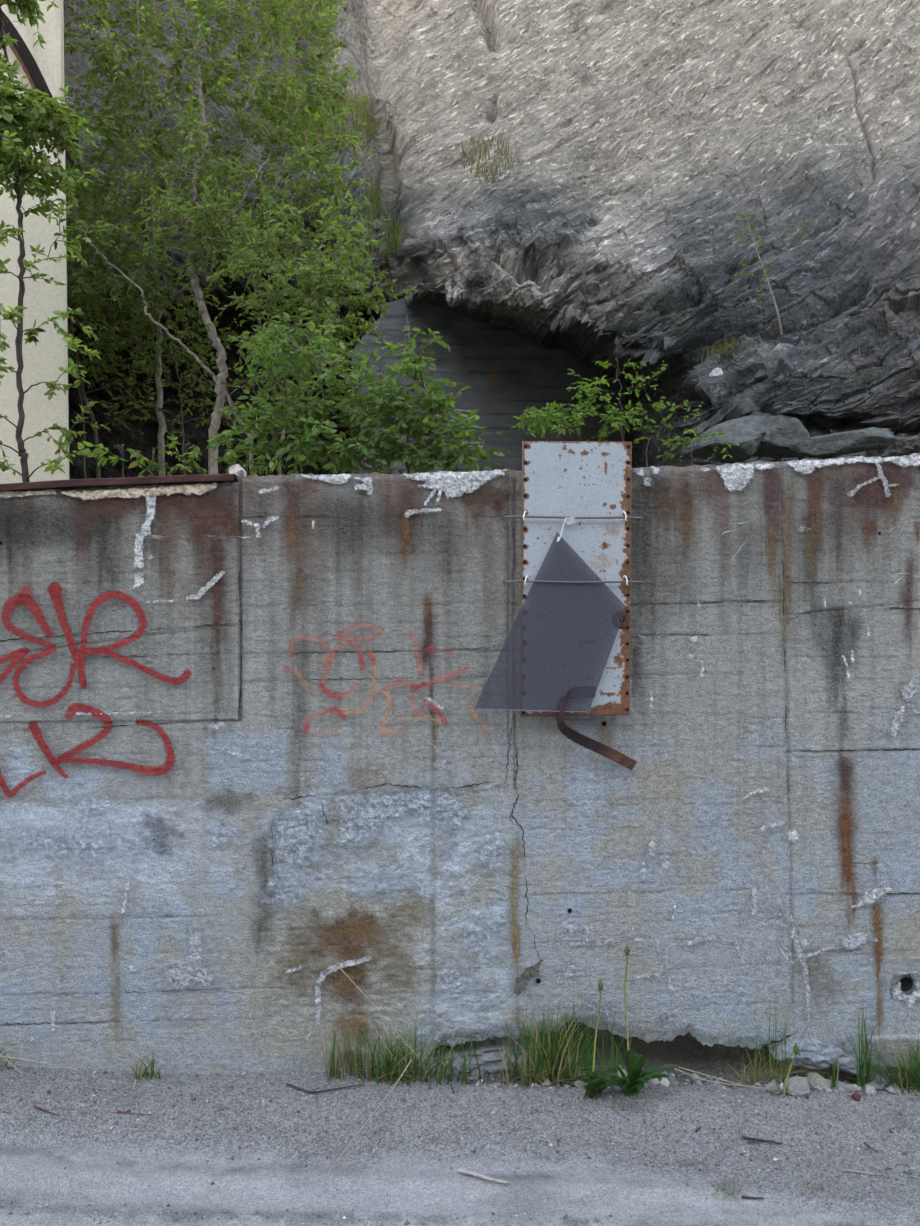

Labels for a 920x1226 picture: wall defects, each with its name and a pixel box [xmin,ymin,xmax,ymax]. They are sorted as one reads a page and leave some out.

damp [0,483,217,574]
rust [902,558,914,633]
crack [271,723,539,957]
rust [838,754,856,924]
rust [288,910,412,1040]
peeling [770,895,920,1023]
rust [874,906,883,1035]